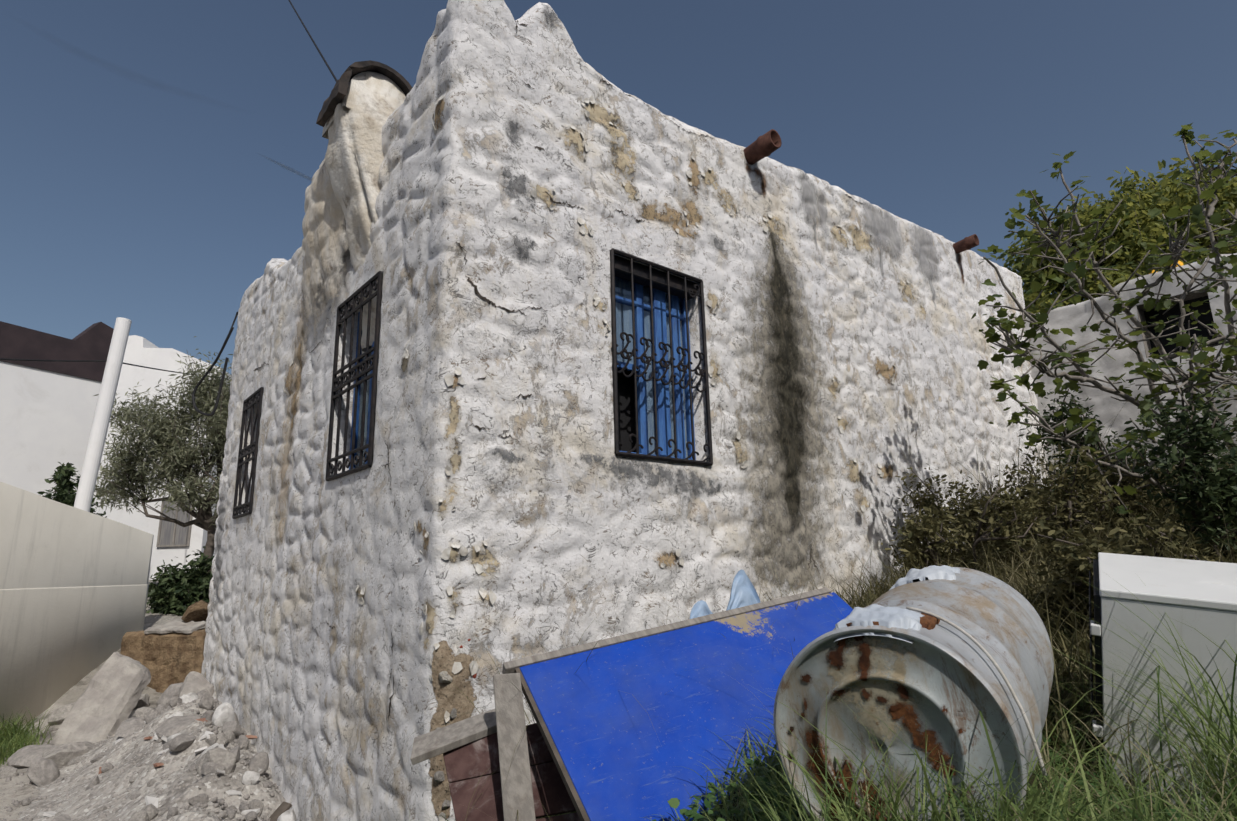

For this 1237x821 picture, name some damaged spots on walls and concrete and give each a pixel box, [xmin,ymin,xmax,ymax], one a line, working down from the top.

rust [746,164,767,197]
damp [801,172,828,245]
crack [456,242,548,316]
damp [863,202,938,303]
damp [737,230,833,592]
spalling [419,586,478,732]
spalling [428,754,453,821]